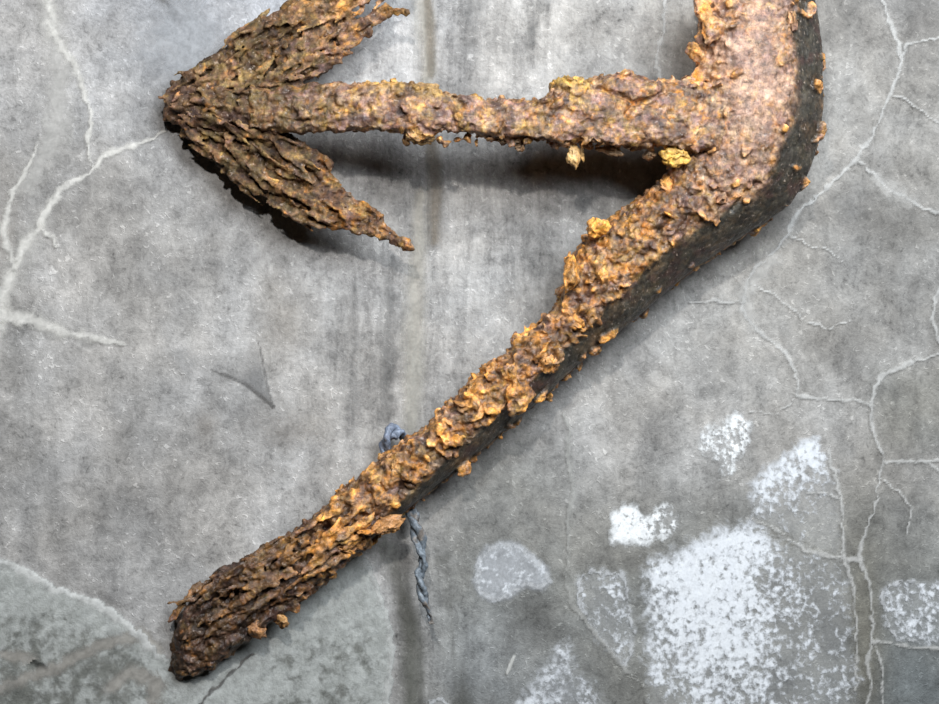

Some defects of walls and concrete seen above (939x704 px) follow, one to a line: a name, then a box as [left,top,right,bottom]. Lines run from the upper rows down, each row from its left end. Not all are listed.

crack [0,0,167,345]
rust [403,130,436,146]
rust [559,140,624,170]
rust [642,146,691,191]
crack [689,0,939,704]
damp [700,412,752,474]
rust [339,514,406,555]
damp [474,542,551,601]
damp [577,436,863,704]
rust [247,613,290,640]
damp [879,580,939,643]
damp [516,645,596,704]